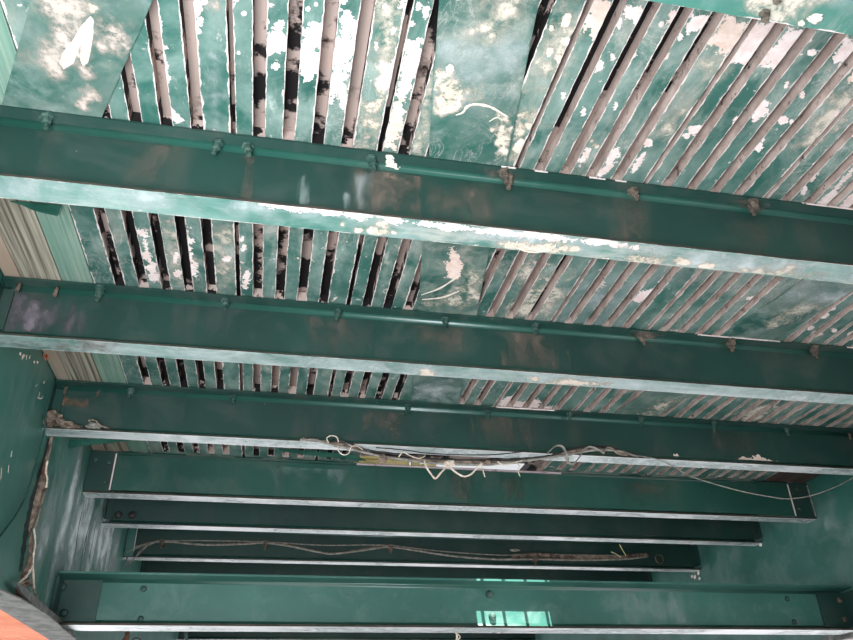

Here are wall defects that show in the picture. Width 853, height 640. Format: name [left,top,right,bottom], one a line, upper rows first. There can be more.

peeling [267,19,287,70]
peeling [300,21,322,83]
peeling [329,0,358,110]
peeling [583,0,611,41]
peeling [616,5,644,30]
peeling [677,13,710,41]
peeling [706,14,775,65]
peeling [760,27,803,69]
peeling [384,37,424,151]
peeling [589,138,653,182]
peeling [173,223,199,277]
peeling [258,203,639,250]